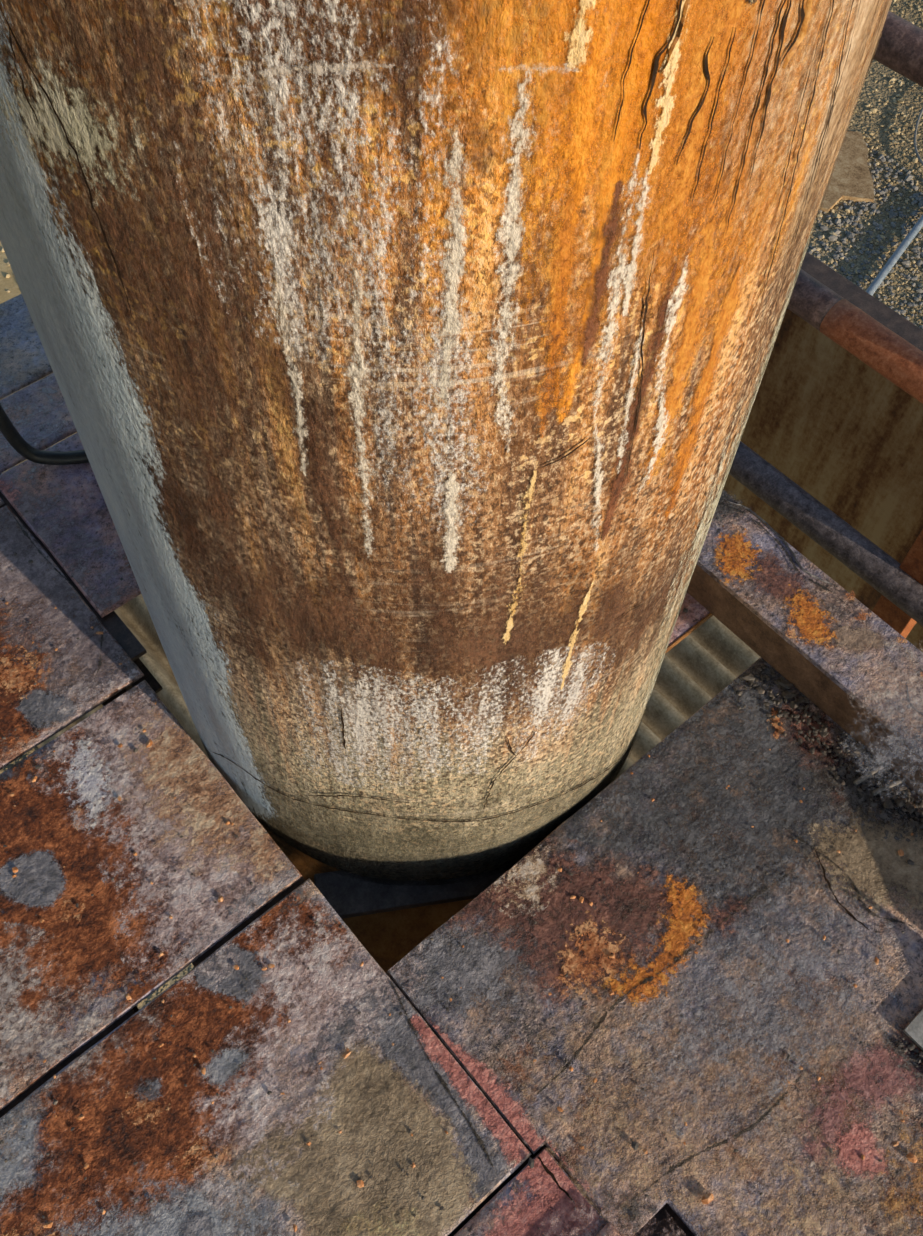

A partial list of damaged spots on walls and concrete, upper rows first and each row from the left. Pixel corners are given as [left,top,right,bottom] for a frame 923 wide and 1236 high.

corrosion [0,0,713,728]
corrosion [234,0,835,541]
crack [613,0,691,150]
crack [676,0,888,330]
leakage [295,580,607,788]
leakage [0,932,125,1116]
corrosion [0,605,354,1236]
leakage [201,904,422,1181]
leakage [28,668,634,989]
corrosion [446,838,749,1015]
crack [631,1071,806,1201]
crack [537,826,915,1095]